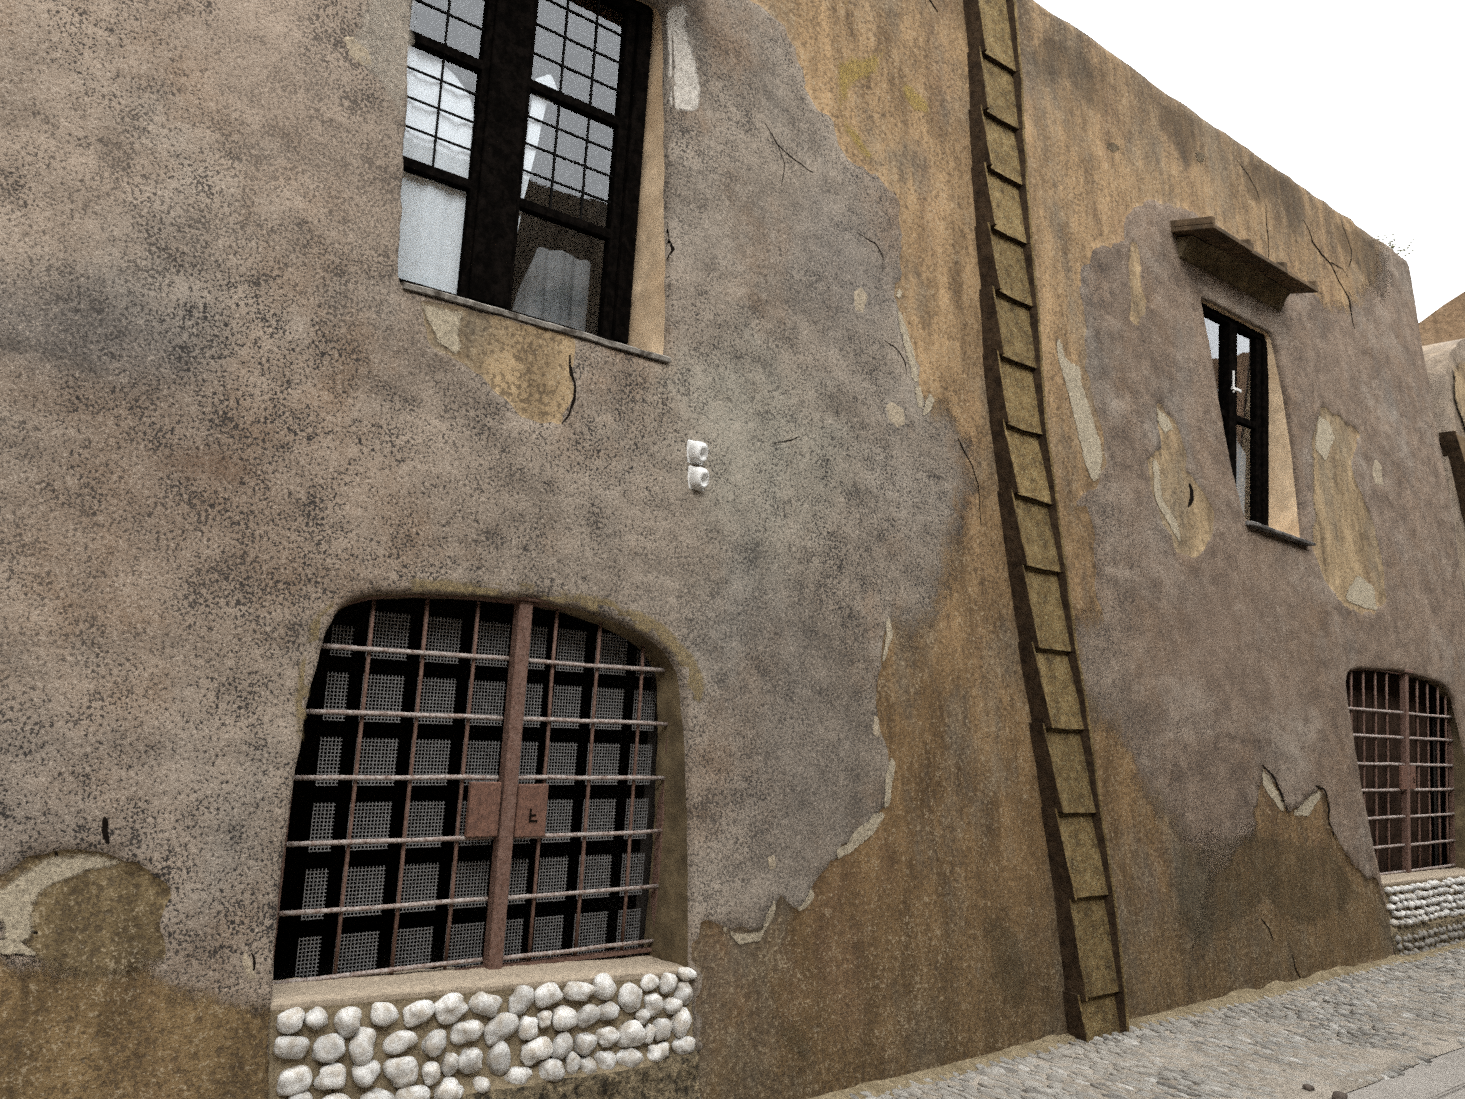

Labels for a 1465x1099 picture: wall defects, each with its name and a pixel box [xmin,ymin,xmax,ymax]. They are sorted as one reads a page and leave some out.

peeling [666,3,700,111]
spalling [421,301,575,424]
peeling [1016,0,1386,628]
crack [1238,161,1269,258]
crack [1304,221,1355,328]
peeling [691,0,1067,1099]
peeling [0,849,271,1099]
spalling [1086,692,1392,1020]